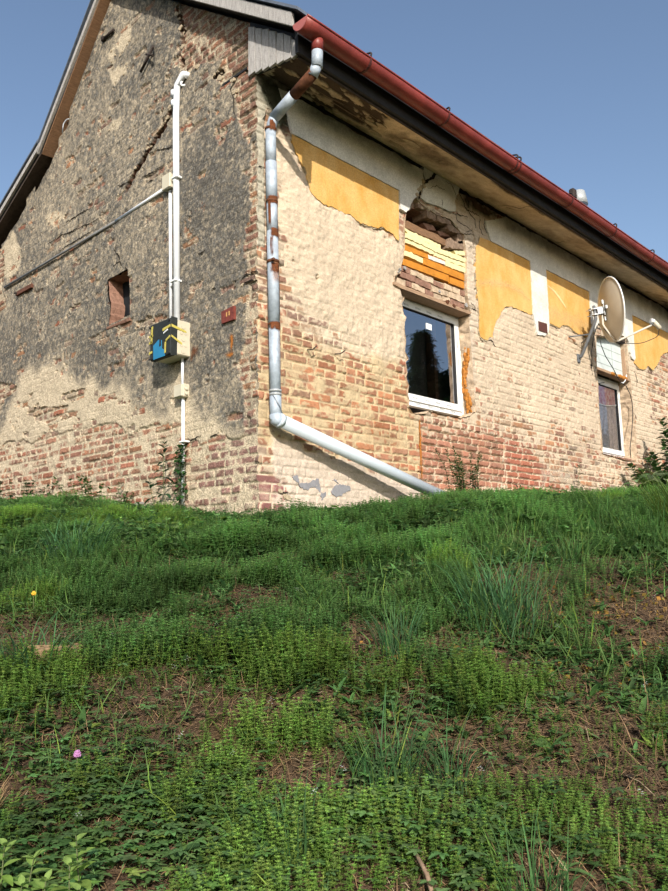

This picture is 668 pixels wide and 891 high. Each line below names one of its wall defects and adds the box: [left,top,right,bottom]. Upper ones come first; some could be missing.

crack [117,98,173,194]
peeling [290,133,464,252]
spalling [466,192,508,217]
peeling [473,236,532,342]
peeling [546,270,591,339]
peeling [632,315,668,371]
spalling [27,388,87,425]
peeling [292,475,351,500]